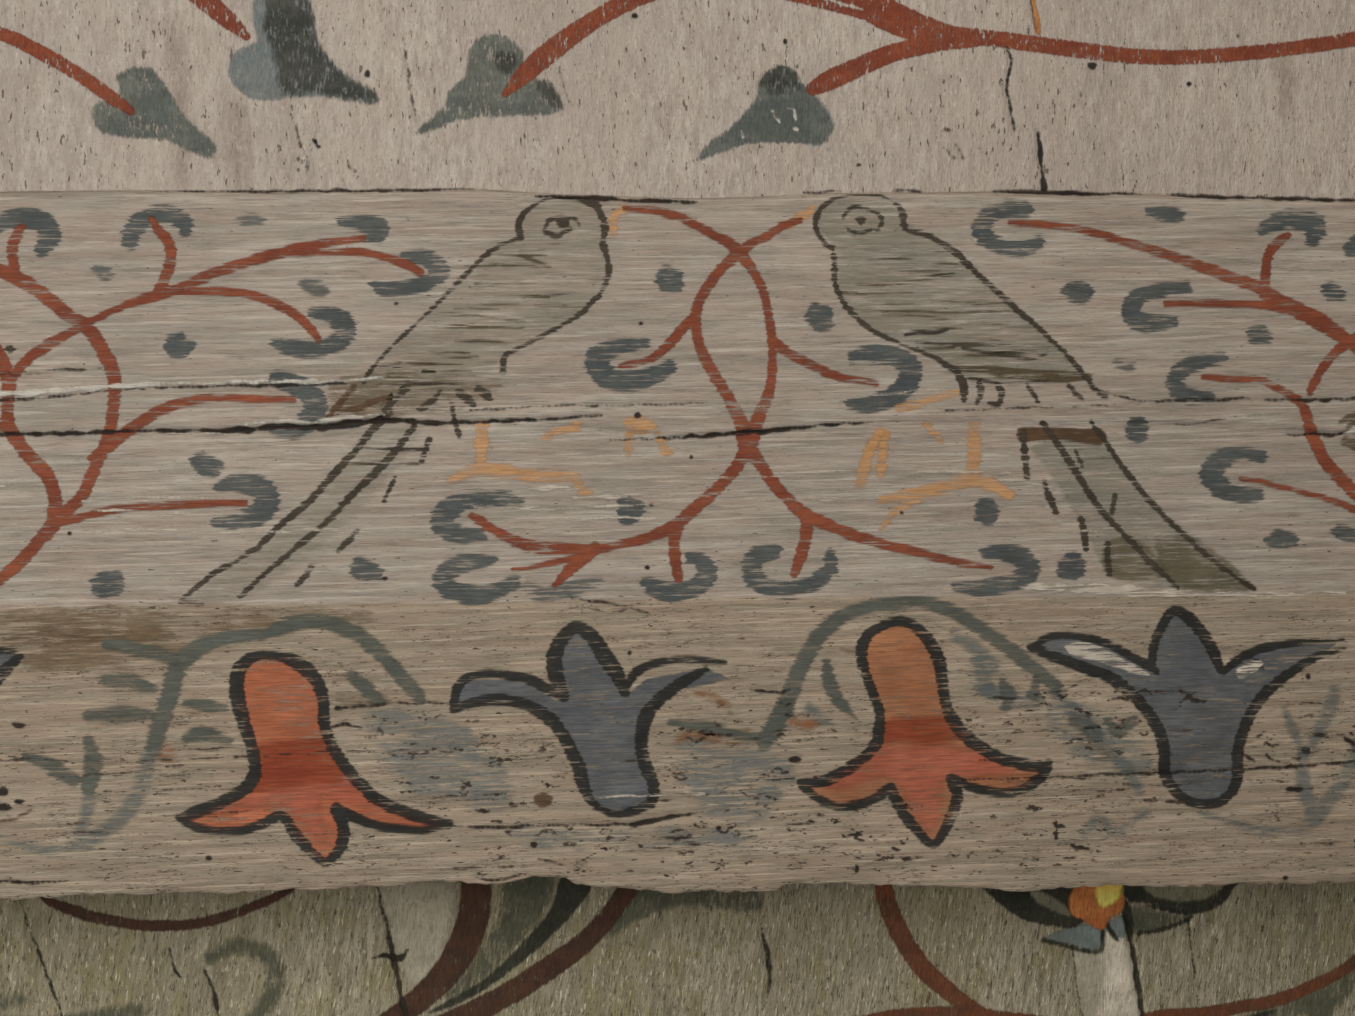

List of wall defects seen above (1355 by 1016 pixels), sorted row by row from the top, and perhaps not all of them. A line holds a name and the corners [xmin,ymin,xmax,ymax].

crack [993,0,1355,202]
crack [160,186,456,194]
crack [535,195,695,204]
crack [0,368,602,436]
crack [624,387,1043,441]
crack [1092,395,1355,450]
crack [375,887,408,1016]